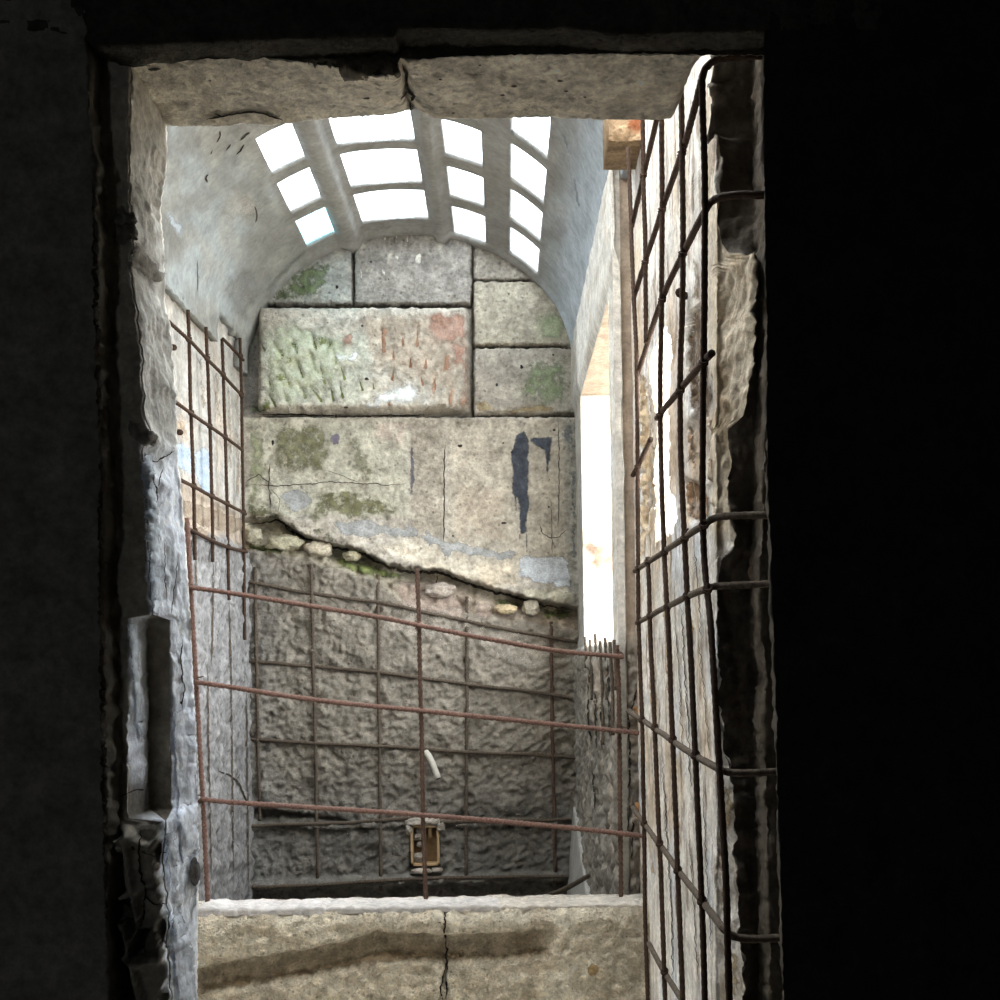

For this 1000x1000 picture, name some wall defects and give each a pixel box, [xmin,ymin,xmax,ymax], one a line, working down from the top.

rust [429,313,467,378]
leakage [371,385,416,405]
crack [247,465,572,610]
spalling [169,55,780,1000]
crack [438,912,449,1000]